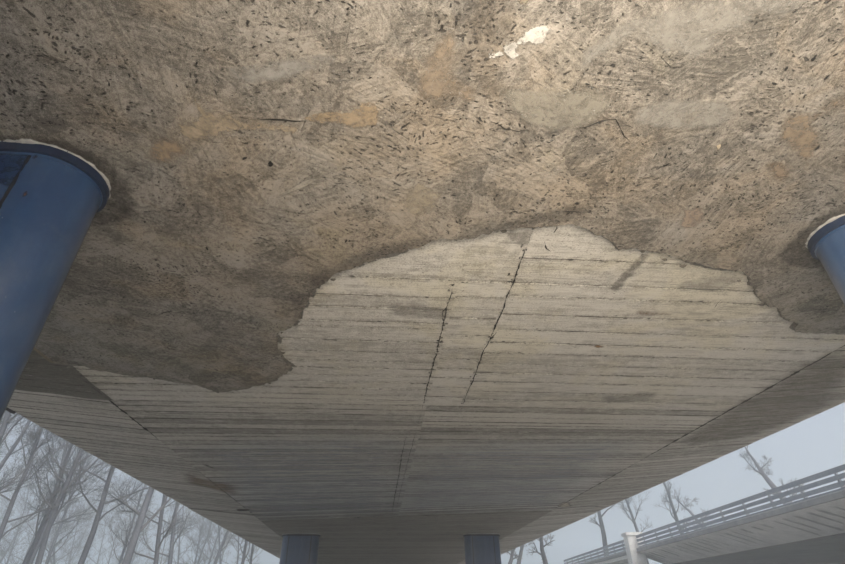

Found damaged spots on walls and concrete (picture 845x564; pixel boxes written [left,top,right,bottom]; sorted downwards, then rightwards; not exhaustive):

spalling [67,224,845,411]
crack [392,211,581,511]